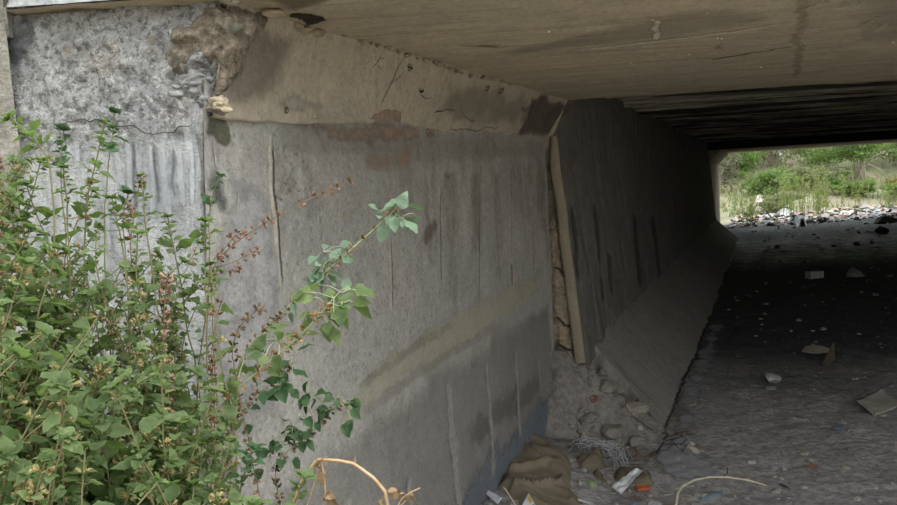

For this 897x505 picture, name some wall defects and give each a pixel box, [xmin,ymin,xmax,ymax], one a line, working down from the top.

crack [51,119,192,135]
spalling [169,67,233,116]
crack [421,95,503,132]
water stain [114,136,205,218]
water stain [99,188,111,246]